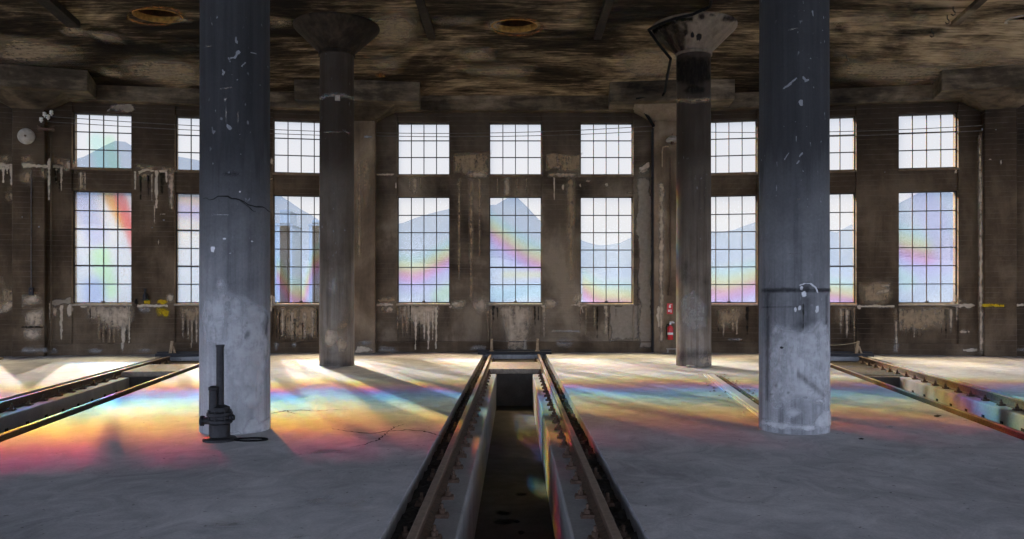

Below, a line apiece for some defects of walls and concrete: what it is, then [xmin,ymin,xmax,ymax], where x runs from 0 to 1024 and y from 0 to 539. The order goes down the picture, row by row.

damp [0,156,86,200]
damp [134,165,174,223]
crack [203,196,271,213]
damp [89,306,131,350]
damp [182,296,318,405]
crack [271,409,441,447]